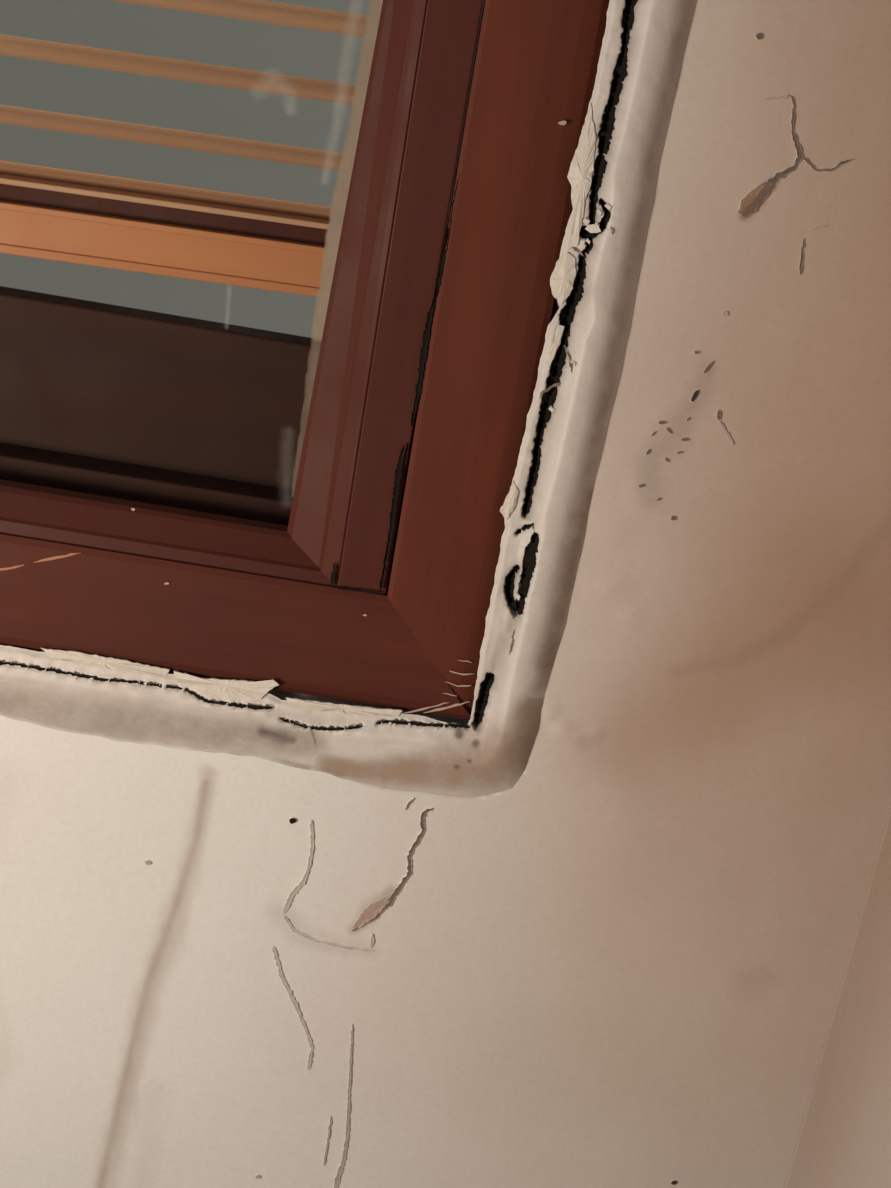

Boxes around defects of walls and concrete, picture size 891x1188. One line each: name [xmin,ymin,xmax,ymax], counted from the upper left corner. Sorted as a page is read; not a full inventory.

crack [737,95,854,218]
peeling [550,103,601,305]
peeling [548,325,565,365]
spalling [646,421,689,462]
peeling [500,481,519,519]
peeling [40,647,279,700]
peeling [286,697,402,716]
crack [272,798,433,1070]
crack [324,1025,354,1188]